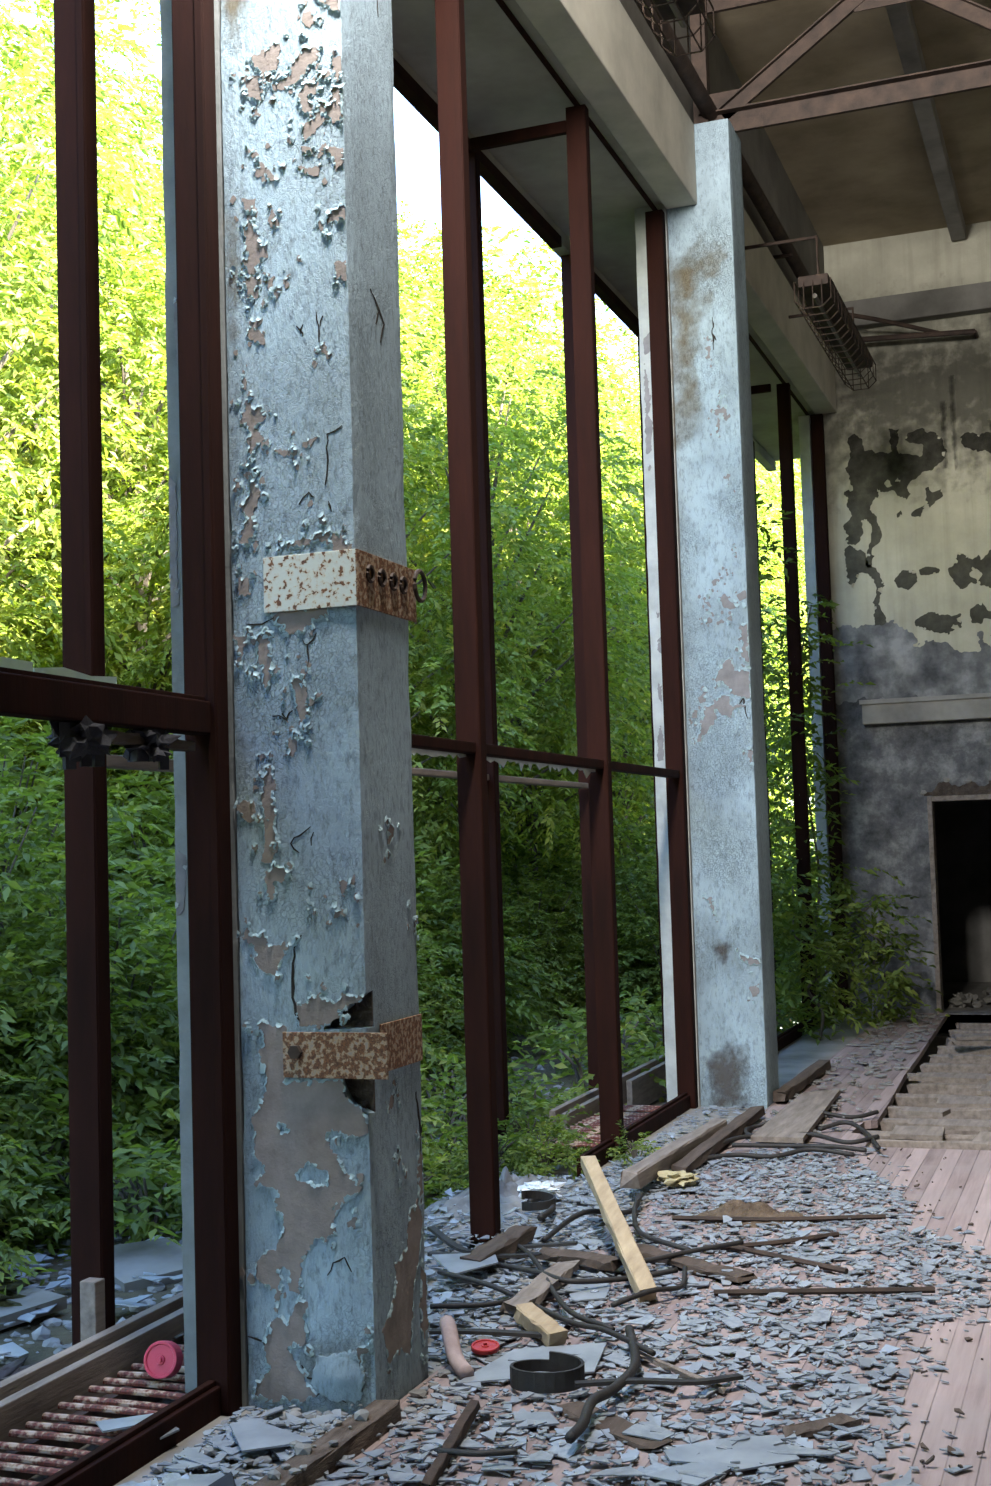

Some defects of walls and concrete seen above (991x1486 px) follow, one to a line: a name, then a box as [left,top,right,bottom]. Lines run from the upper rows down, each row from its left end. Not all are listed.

peeling [229,0,352,598]
flaking render [832,428,991,705]
crack [291,935,302,1026]
peeling [239,973,401,1406]